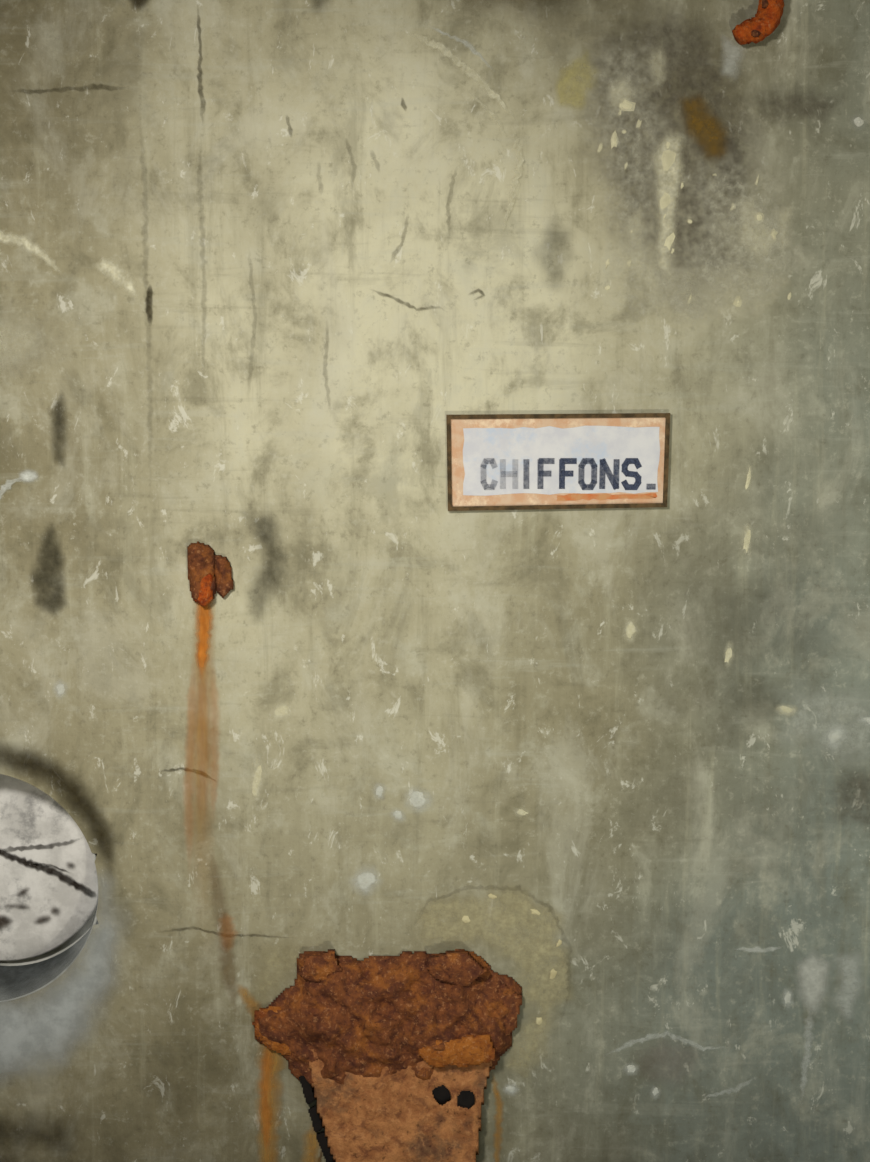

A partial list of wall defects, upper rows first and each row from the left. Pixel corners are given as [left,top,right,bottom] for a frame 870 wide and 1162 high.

water stain [34,533,62,611]
rust [197,603,210,688]
rust [261,1048,278,1162]
rust [299,1075,333,1162]